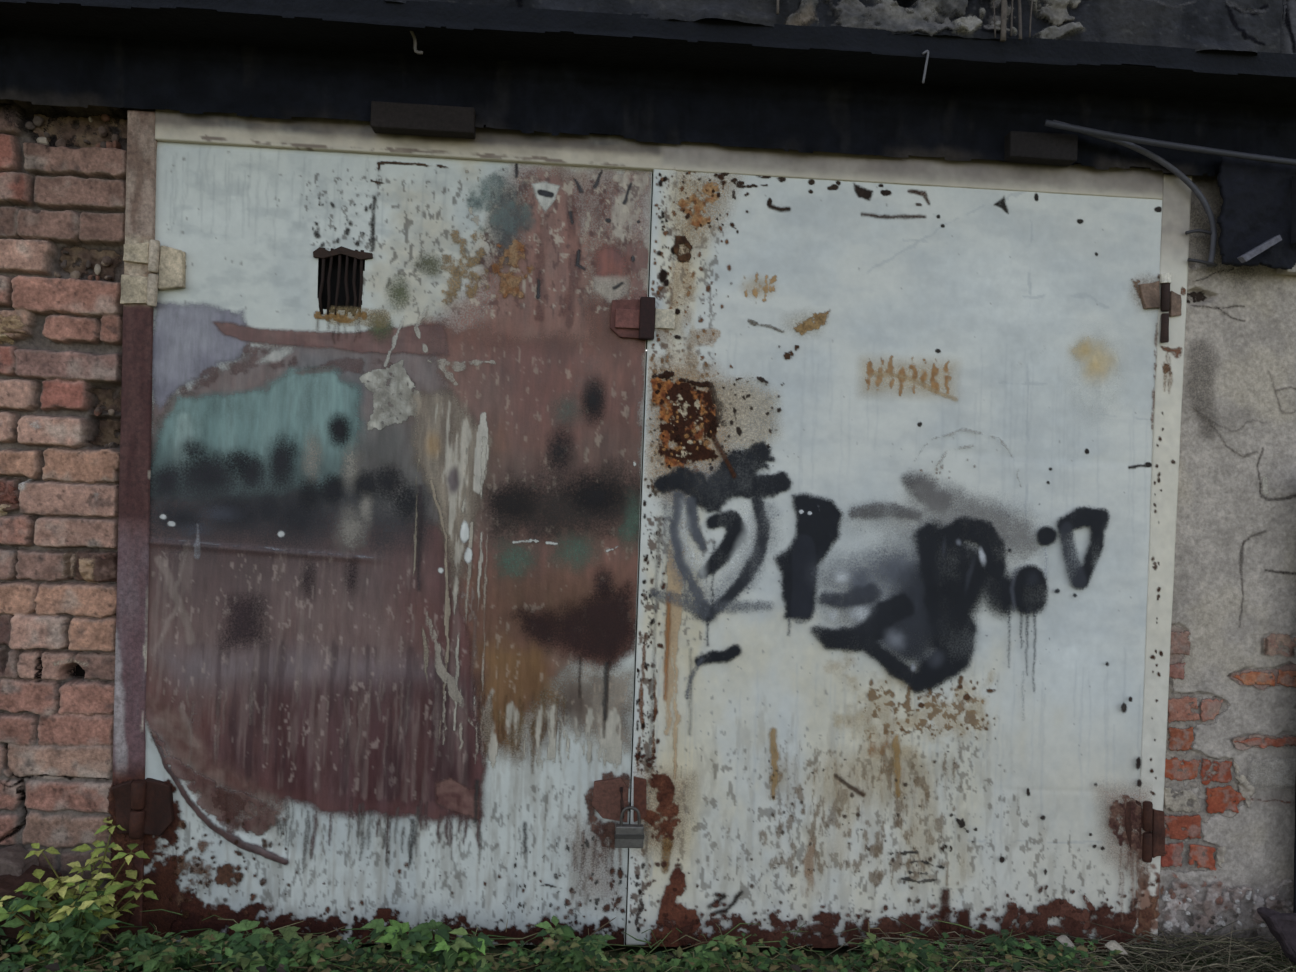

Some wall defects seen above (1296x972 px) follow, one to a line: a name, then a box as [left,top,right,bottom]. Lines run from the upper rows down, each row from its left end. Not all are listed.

spalling [786,0,1017,36]
spalling [1030,0,1085,39]
crack [1212,426,1296,591]
corrosion [106,171,1164,950]
peeling [436,778,480,820]
peeling [1160,624,1296,942]
peeling [502,836,600,919]